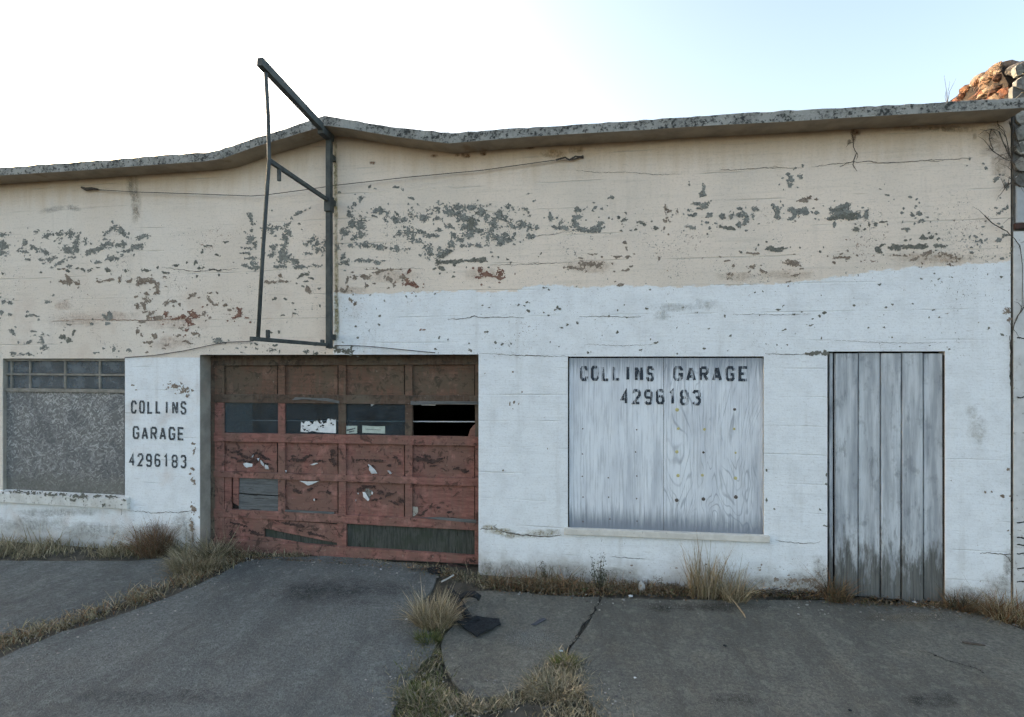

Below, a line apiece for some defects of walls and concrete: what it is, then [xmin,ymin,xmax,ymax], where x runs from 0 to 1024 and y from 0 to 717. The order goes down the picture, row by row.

crack [721,130,961,171]
spalling [771,164,888,231]
spalling [875,157,1012,281]
peeling [0,220,251,357]
peeling [233,181,760,357]
peeling [719,241,804,287]
peeling [213,330,280,353]
crack [482,524,560,537]
crack [568,597,602,649]